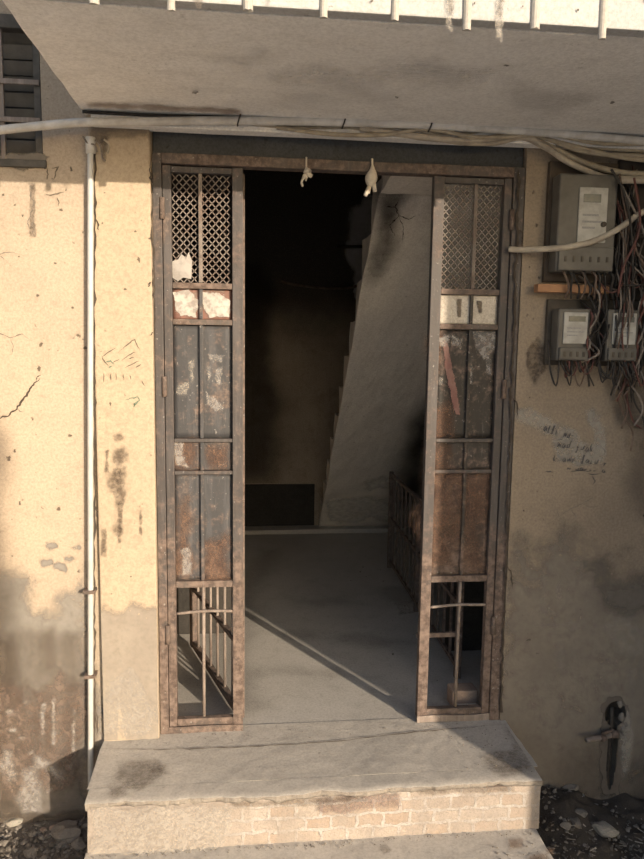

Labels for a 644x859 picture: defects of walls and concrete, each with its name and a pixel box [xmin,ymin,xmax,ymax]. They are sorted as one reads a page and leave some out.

crack [0,375,41,419]
crack [142,168,523,750]
water stain [0,640,88,825]
peeling [0,545,159,817]
peeling [501,533,644,800]